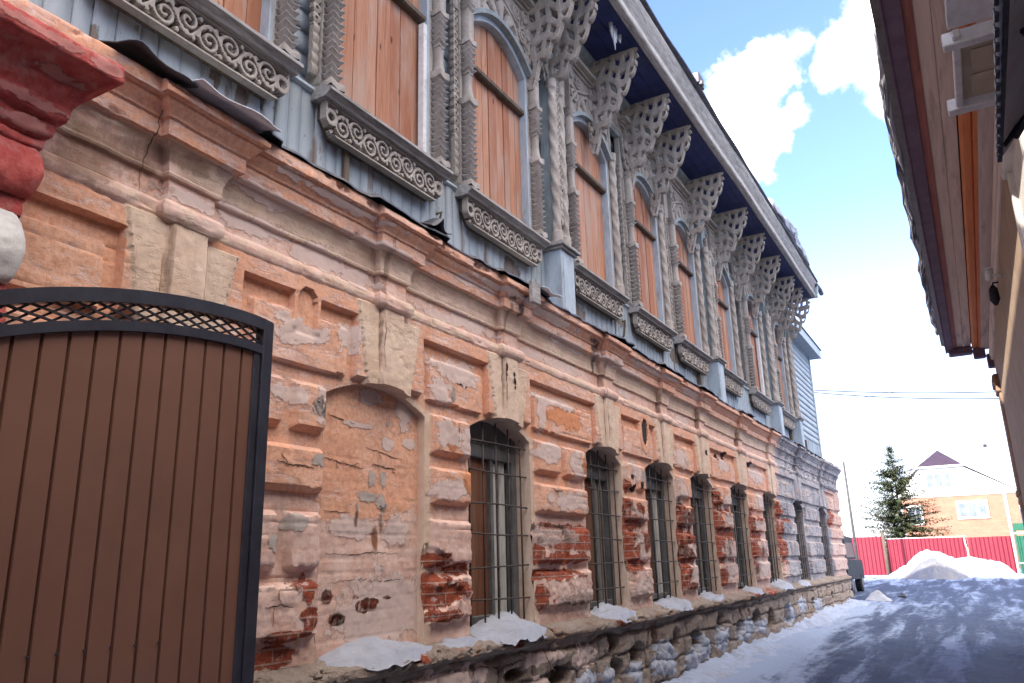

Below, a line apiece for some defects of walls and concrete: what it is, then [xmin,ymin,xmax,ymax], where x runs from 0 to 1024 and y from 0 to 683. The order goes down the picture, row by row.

crack [139,109,164,189]
peeling [135,164,385,291]
peeling [273,309,366,358]
peeling [444,268,713,404]
peeling [270,381,326,435]
crack [277,447,399,473]
peeling [423,355,479,505]
peeling [529,390,593,616]
spalling [622,457,654,607]
peeling [673,441,700,596]
spalling [711,463,811,598]
peeling [254,551,472,672]